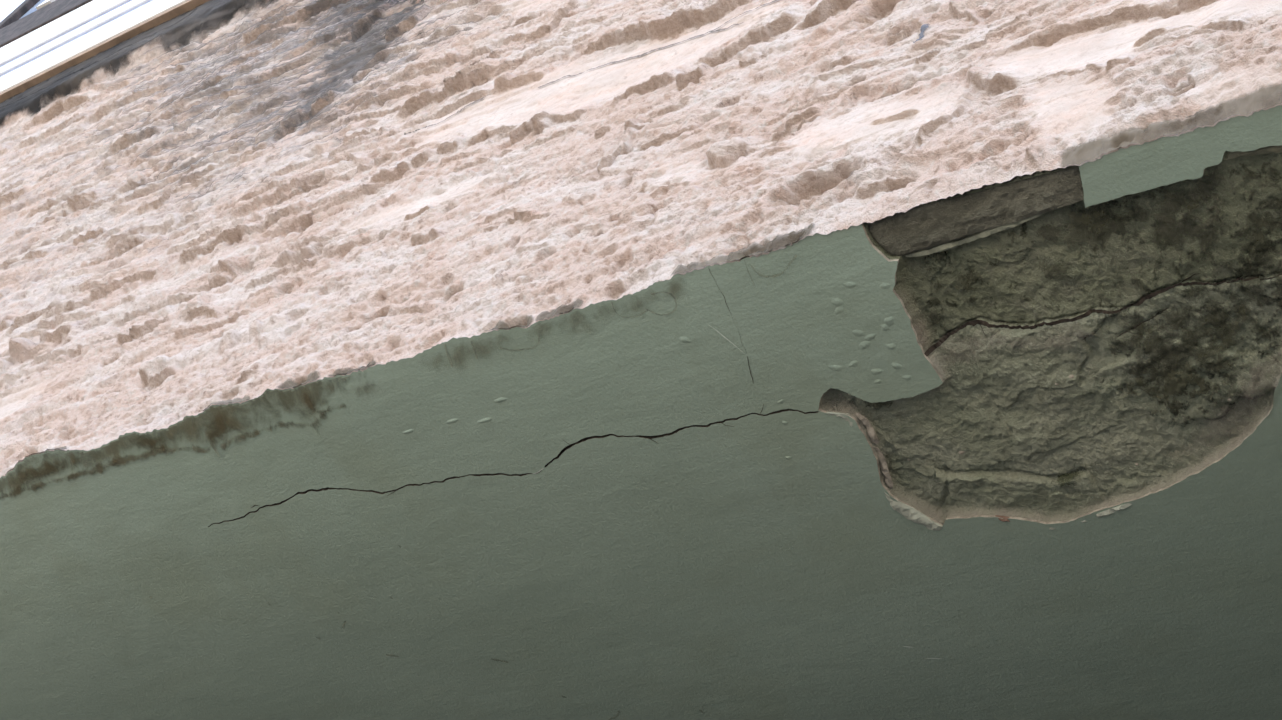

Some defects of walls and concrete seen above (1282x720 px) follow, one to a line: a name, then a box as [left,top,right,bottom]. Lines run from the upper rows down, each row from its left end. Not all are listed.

crack [208,269,819,527]
spalling [820,145,1282,531]
crack [924,273,1282,356]